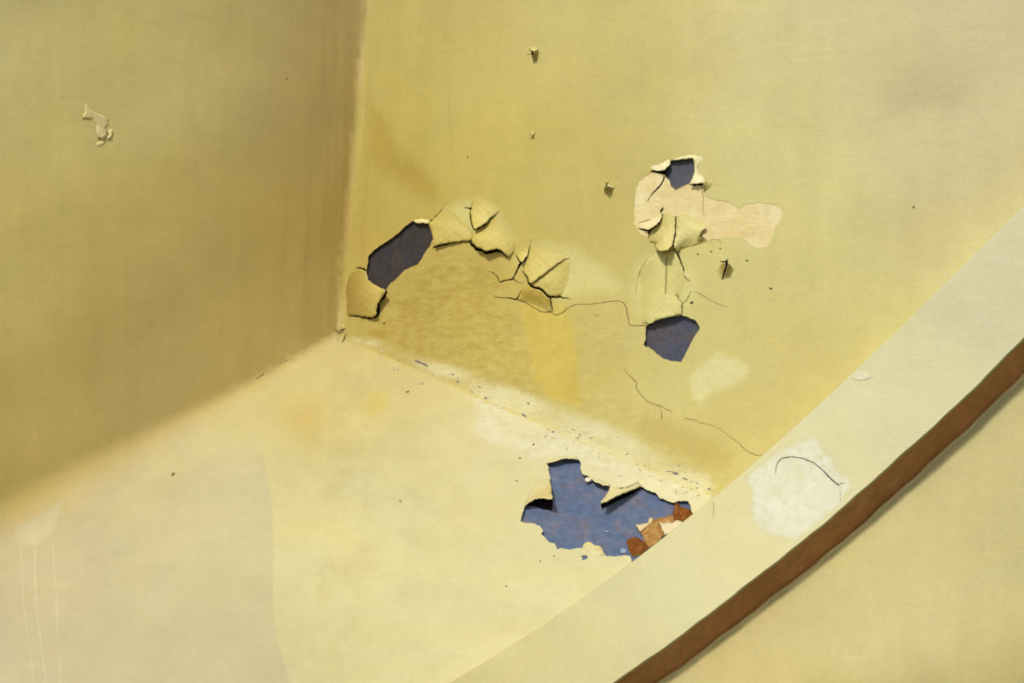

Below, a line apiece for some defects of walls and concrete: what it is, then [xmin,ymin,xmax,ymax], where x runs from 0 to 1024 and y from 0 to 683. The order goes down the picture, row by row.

peeling [82,104,114,147]
peeling [414,155,782,322]
crack [489,241,646,327]
crack [638,256,727,314]
crack [623,369,842,501]
peeling [621,503,693,557]